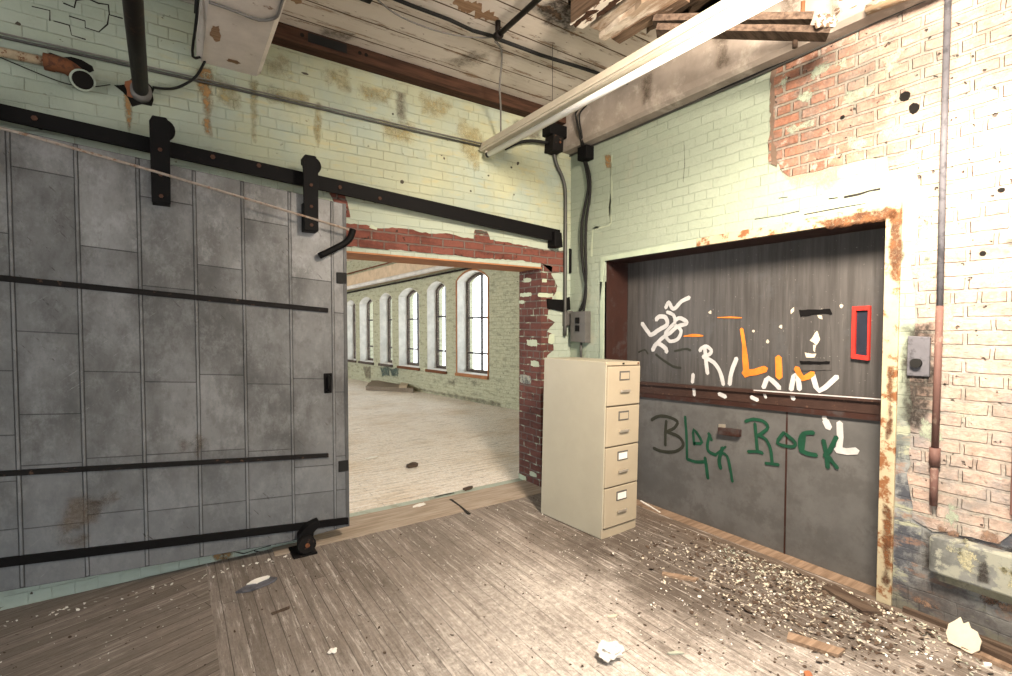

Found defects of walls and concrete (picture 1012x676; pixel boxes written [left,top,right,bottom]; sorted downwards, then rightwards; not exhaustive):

peeling [453,0,499,21]
corrosion [817,206,905,280]
peeling [768,0,1012,574]
corrosion [886,366,894,439]
corrosion [882,505,892,585]
peeling [636,529,992,676]
spalling [980,595,1012,613]